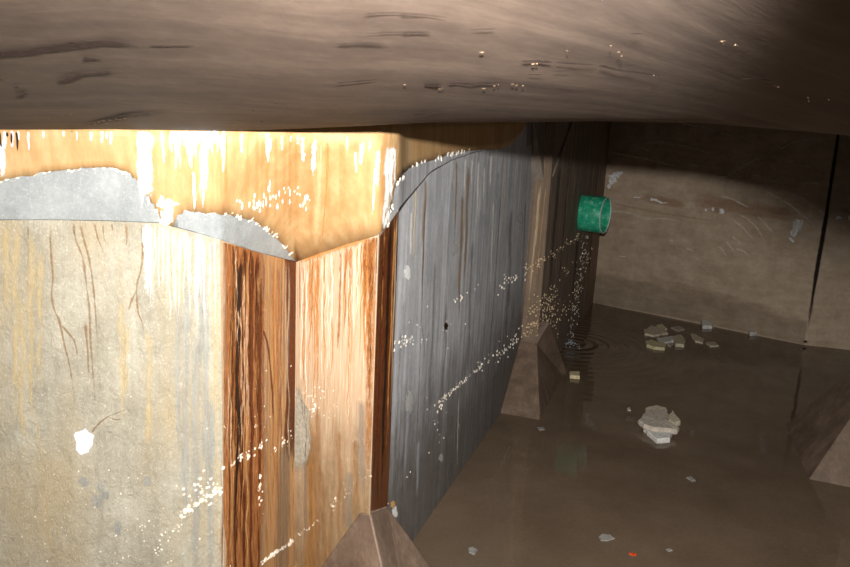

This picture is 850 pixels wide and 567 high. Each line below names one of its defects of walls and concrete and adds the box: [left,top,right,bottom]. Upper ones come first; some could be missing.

damp [0,131,30,176]
peeling [0,167,161,223]
peeling [178,210,297,262]
damp [236,133,328,235]
crack [753,135,840,318]
rust [221,211,399,567]
damp [387,154,593,541]
spalling [74,429,94,455]
damp [154,470,223,556]
damp [261,519,320,565]